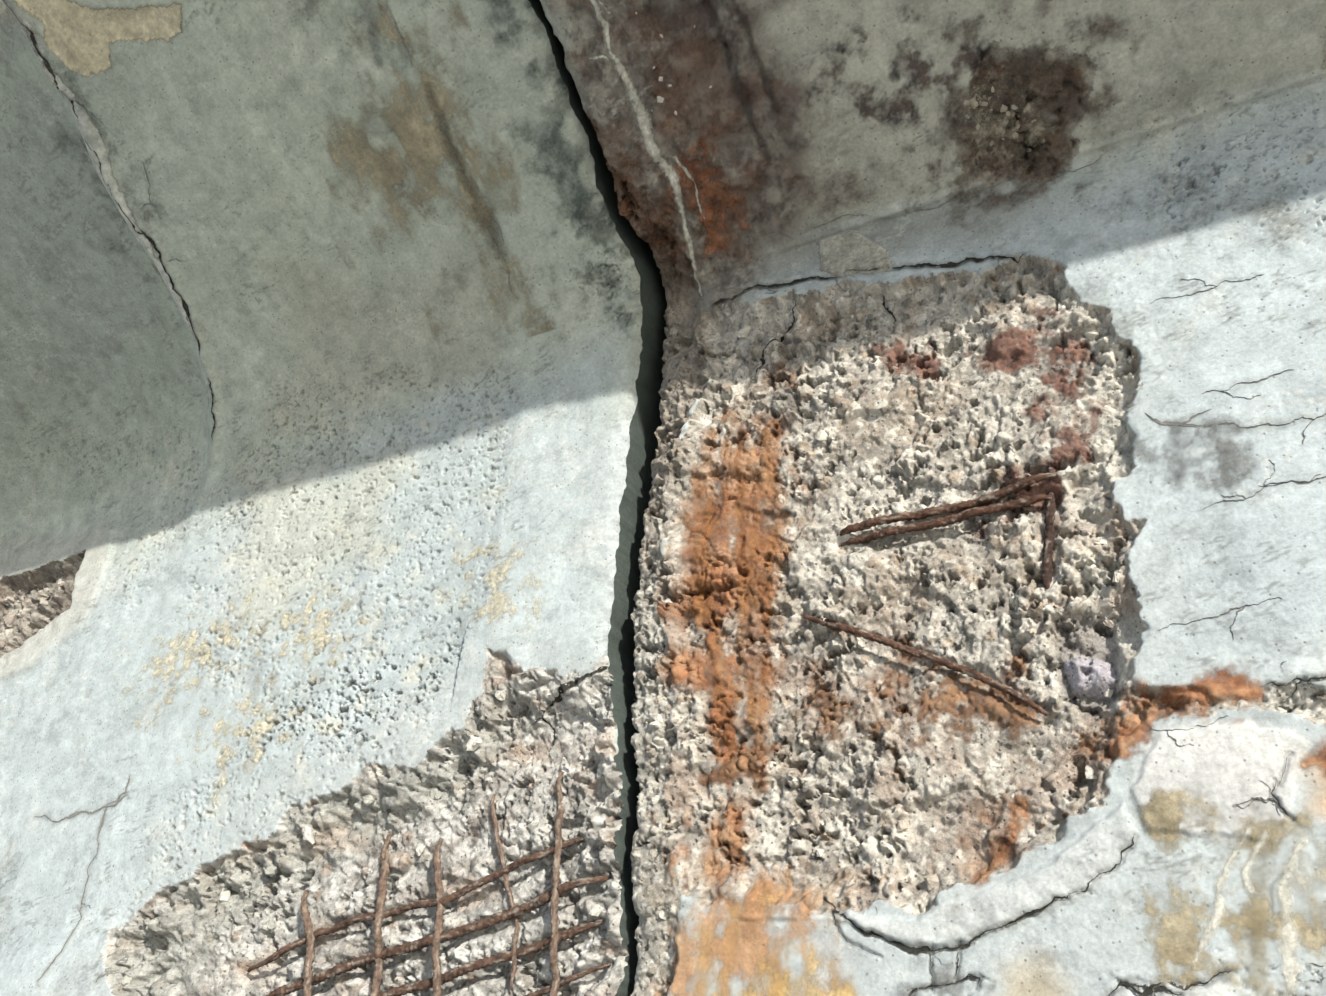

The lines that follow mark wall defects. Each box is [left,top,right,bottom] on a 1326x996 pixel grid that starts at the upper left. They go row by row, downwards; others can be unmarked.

peeling [14,0,197,340]
leakage [585,0,705,296]
leakage [854,16,1114,208]
crack [712,254,1024,375]
corrosion [969,308,1102,524]
spalling [0,550,86,658]
spalling [101,161,1326,996]
corrosion [657,414,855,996]
corrosion [1081,668,1263,759]
crack [822,837,1134,996]
crack [1109,970,1232,996]
leakage [1145,813,1326,996]